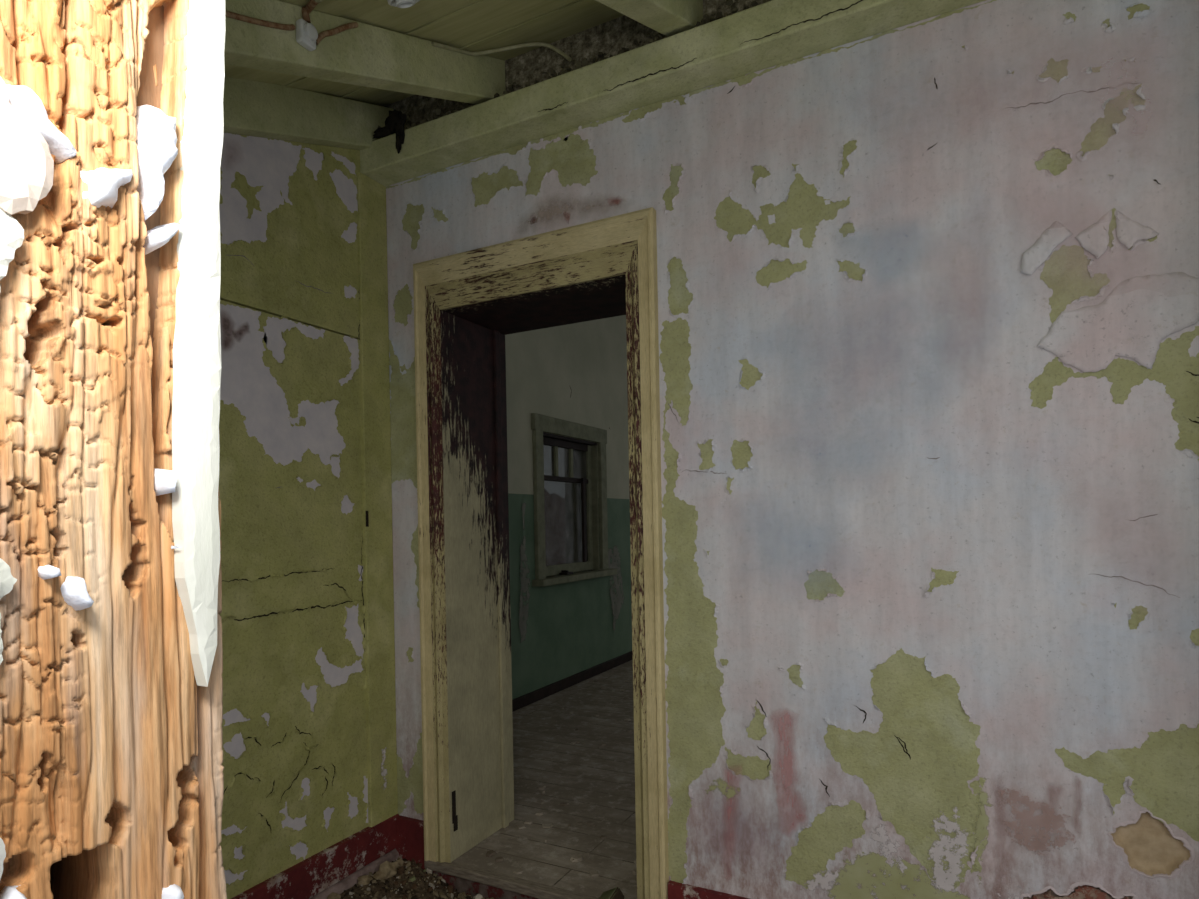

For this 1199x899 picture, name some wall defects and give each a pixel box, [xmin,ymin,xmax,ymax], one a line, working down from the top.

crack [604,58,695,91]
peeling [386,0,996,207]
crack [740,0,863,45]
peeling [219,132,359,248]
peeling [714,164,857,288]
peeling [220,304,360,491]
flaking render [1021,208,1199,461]
crack [222,541,367,691]
peeling [659,256,774,884]
peeling [782,648,1076,899]
peeling [1055,723,1199,879]
spalling [998,882,1138,899]